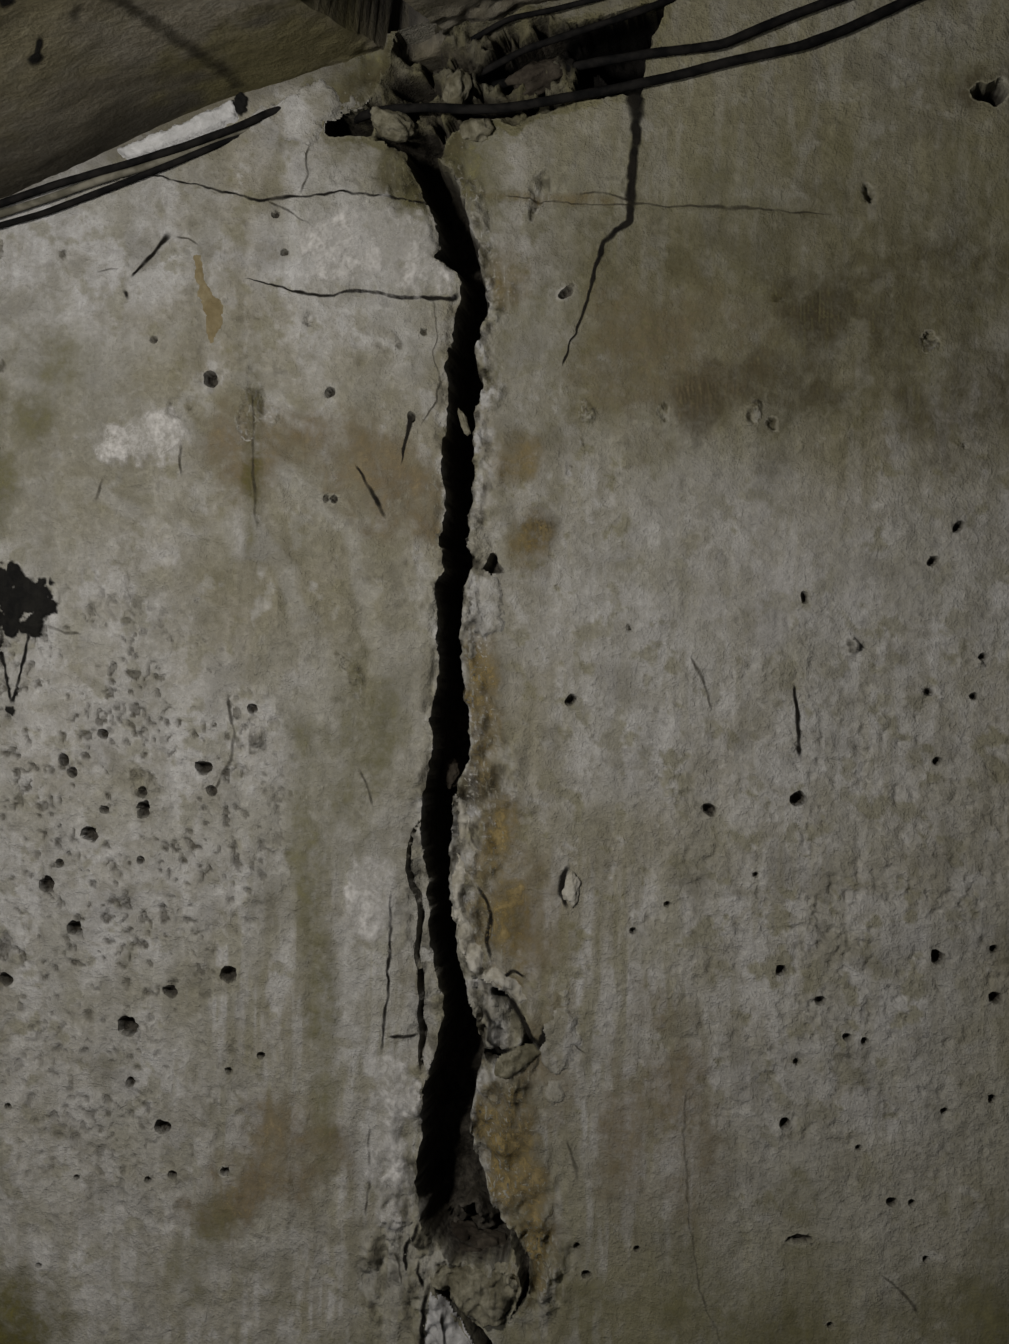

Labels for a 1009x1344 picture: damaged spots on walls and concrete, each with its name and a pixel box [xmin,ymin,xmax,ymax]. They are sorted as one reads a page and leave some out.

spalling [117,2,665,289]
crack [509,93,819,363]
crack [152,150,582,1344]
flaking render [425,1292,474,1344]